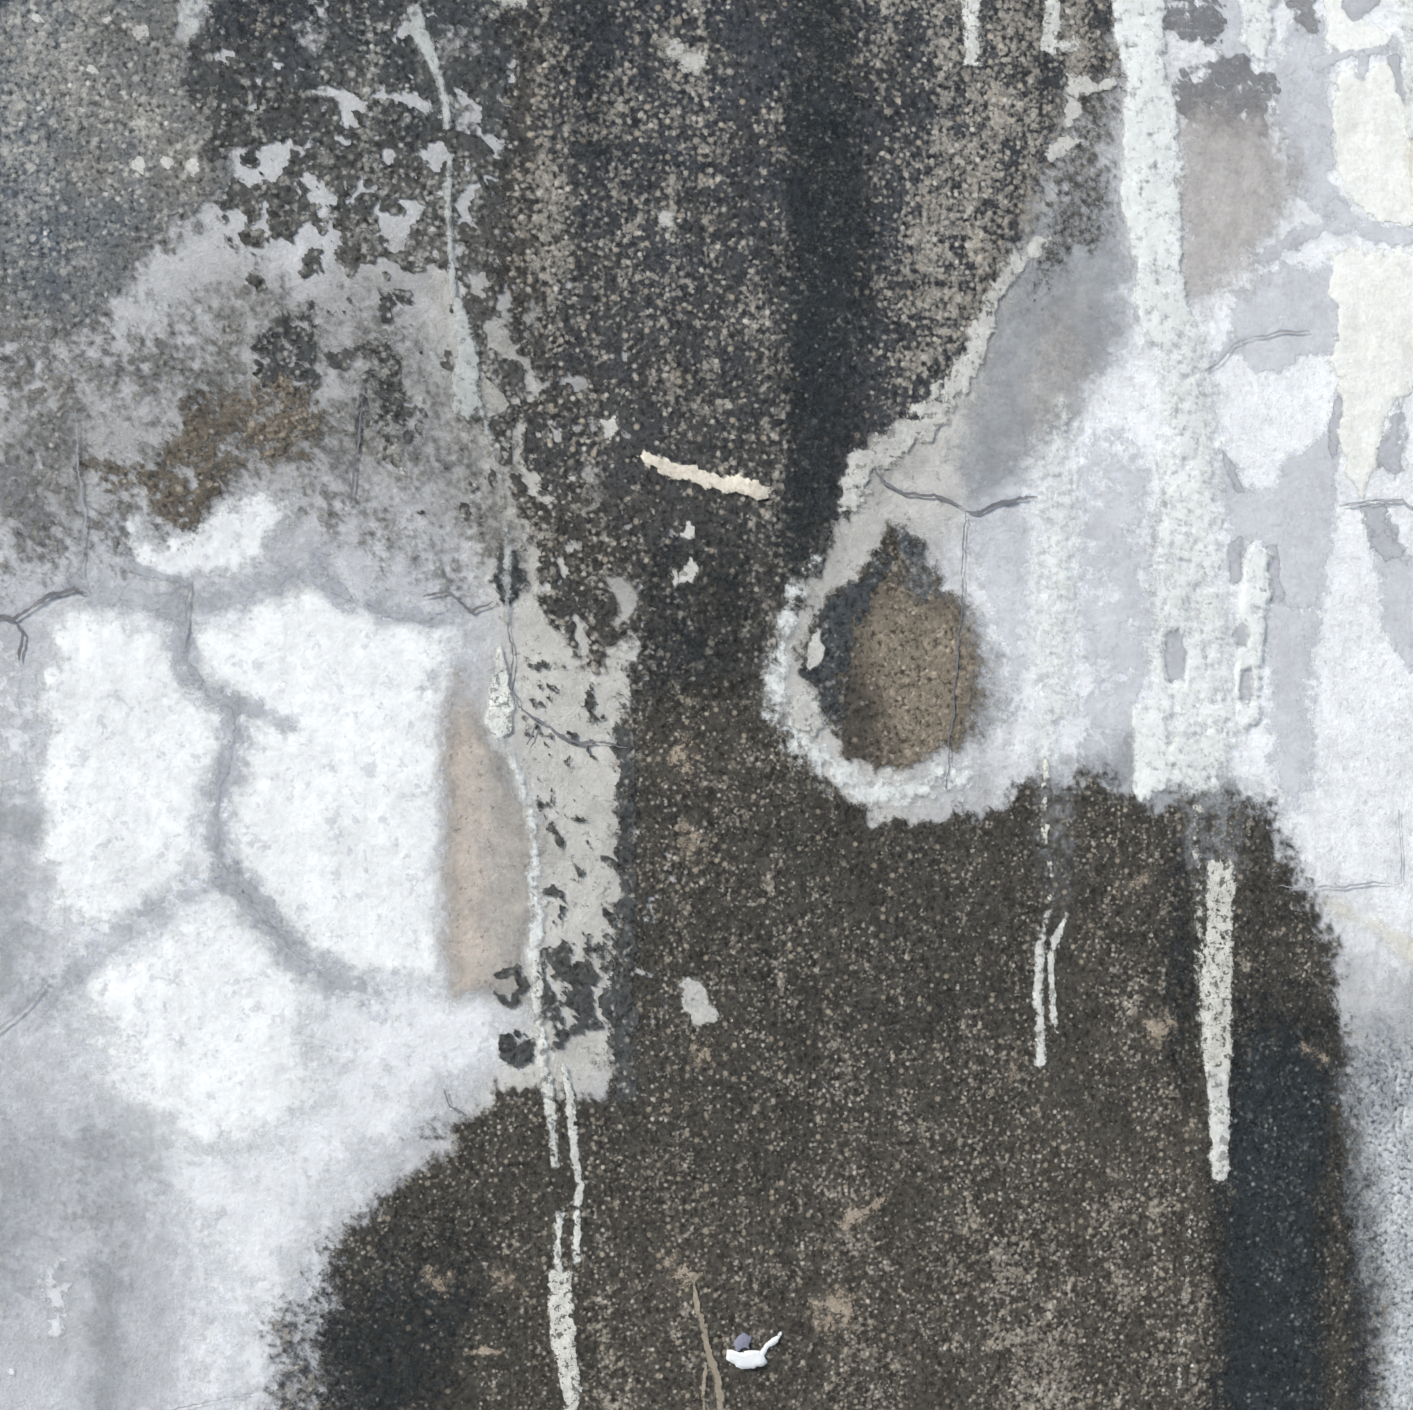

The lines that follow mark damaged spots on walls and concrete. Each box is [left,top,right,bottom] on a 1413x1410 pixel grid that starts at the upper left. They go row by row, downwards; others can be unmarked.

peeling [1199,0,1256,60]
peeling [1209,13,1413,373]
peeling [1376,404,1408,474]
crack [0,410,627,1030]
water stain [581,682,605,726]
crack [874,469,1037,789]
peeling [1219,389,1343,810]
peeling [1360,505,1413,672]
water stain [443,706,544,1008]
water stain [498,1029,536,1068]
water stain [537,939,607,1051]
water stain [598,987,619,1028]